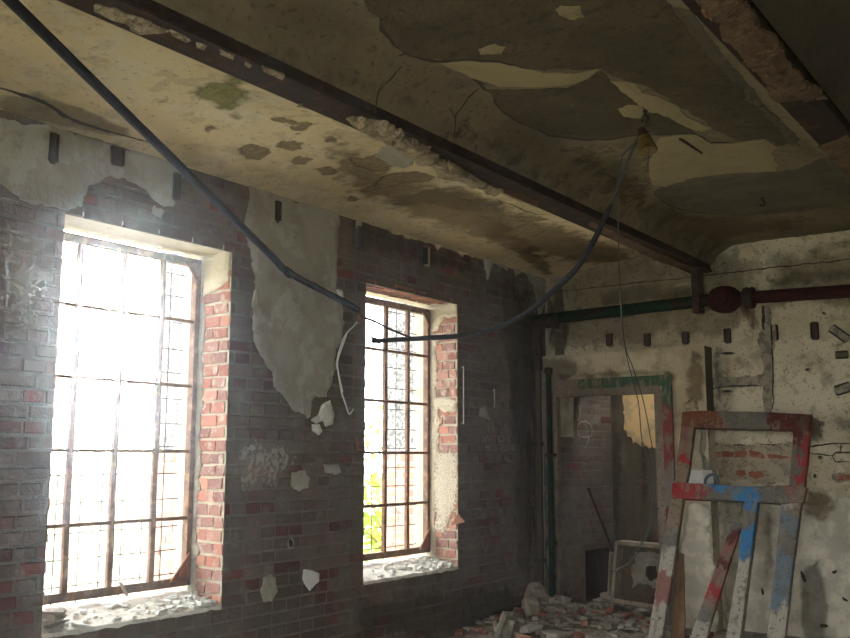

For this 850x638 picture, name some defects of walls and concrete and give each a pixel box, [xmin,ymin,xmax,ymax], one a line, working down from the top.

crack [364,0,729,144]
peeling [365,0,799,146]
peeling [0,118,184,218]
flaking render [346,116,504,197]
damp [339,143,637,274]
peeling [244,186,345,435]
peeling [187,251,231,592]
peeling [427,304,459,558]
crack [810,443,850,463]